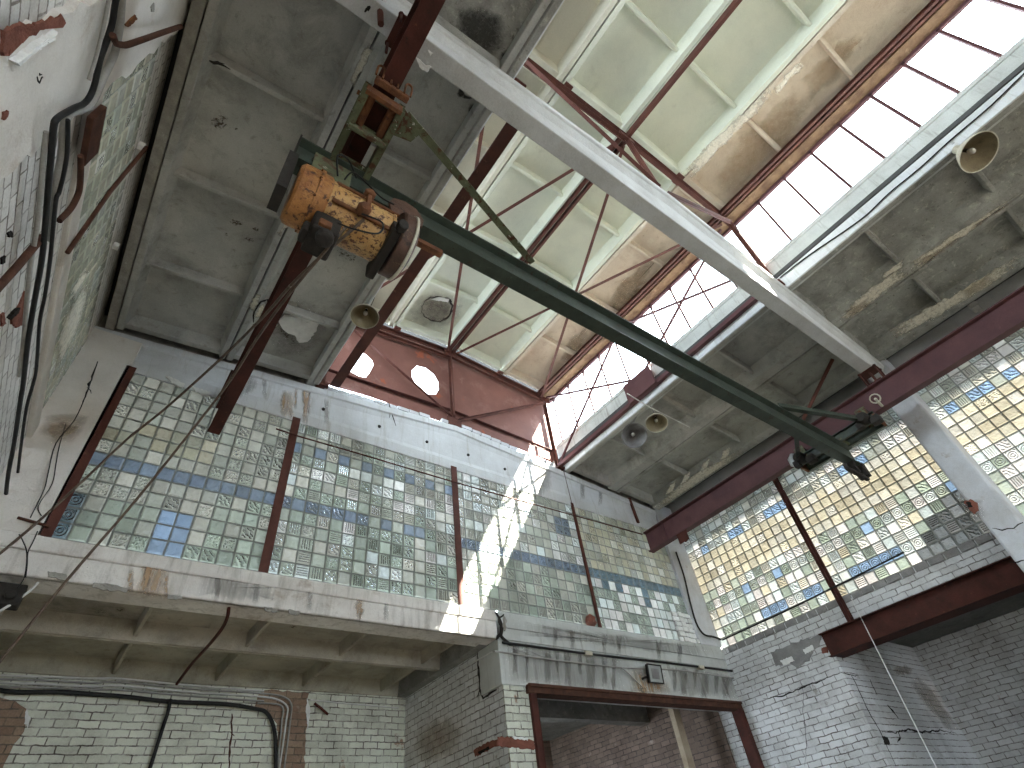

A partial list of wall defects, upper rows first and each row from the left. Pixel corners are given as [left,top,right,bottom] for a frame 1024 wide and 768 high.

spalling [0,13,66,66]
leakage [459,11,507,56]
peeling [276,300,319,343]
corrosion [128,567,168,593]
peeling [770,635,828,668]
peeling [0,697,31,768]
peeling [255,689,311,768]
crack [768,658,954,766]